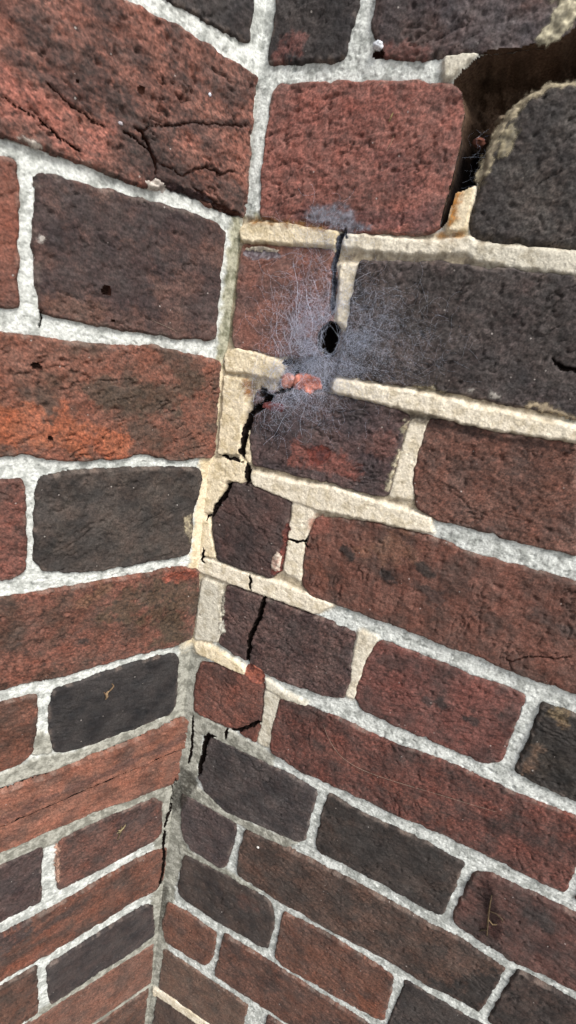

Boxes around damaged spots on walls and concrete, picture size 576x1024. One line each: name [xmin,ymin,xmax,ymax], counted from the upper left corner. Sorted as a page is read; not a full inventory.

crack [4,96,80,151]
crack [47,83,246,216]
spalling [440,26,576,228]
crack [330,230,347,315]
crack [207,368,300,520]
crack [246,575,267,661]
crack [4,715,262,889]